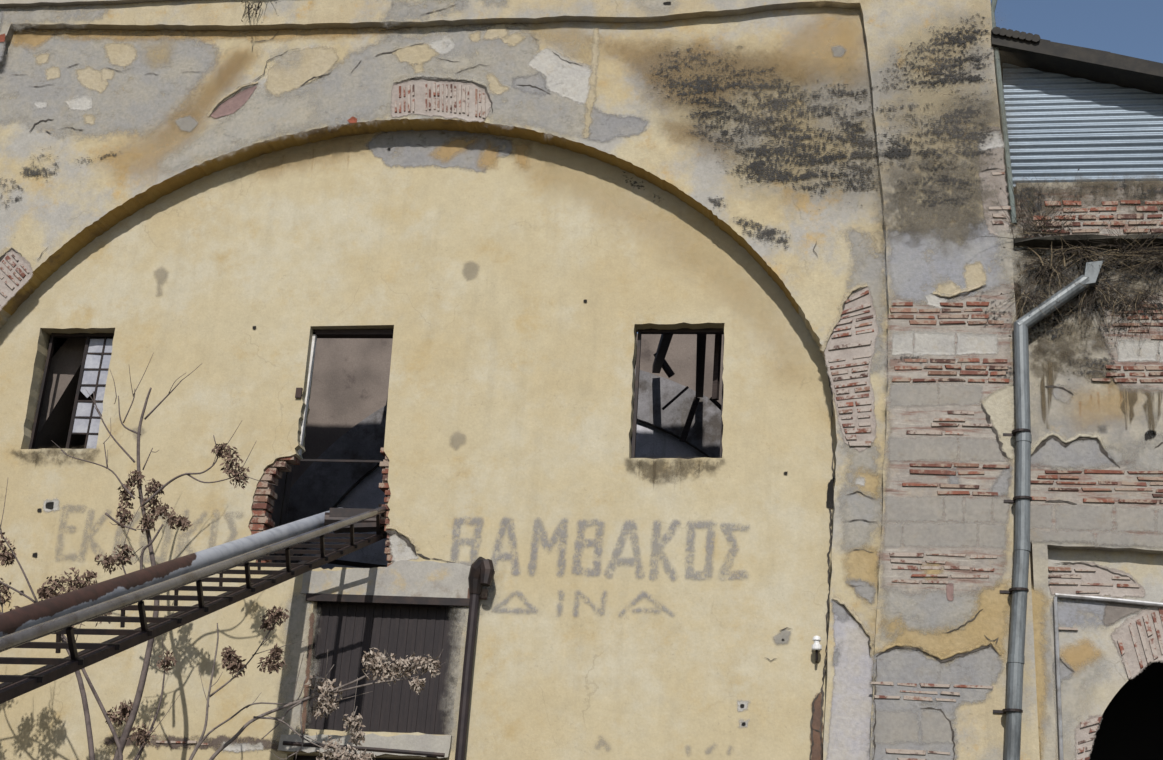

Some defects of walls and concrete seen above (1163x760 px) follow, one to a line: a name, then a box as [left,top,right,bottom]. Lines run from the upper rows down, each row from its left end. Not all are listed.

peeling [0,6,219,138]
peeling [160,23,648,172]
damp [608,5,1002,239]
spalling [0,247,33,310]
damp [733,217,791,248]
spalling [37,499,59,512]
spalling [249,455,300,535]
spalling [379,448,418,567]
spalling [809,126,1163,760]